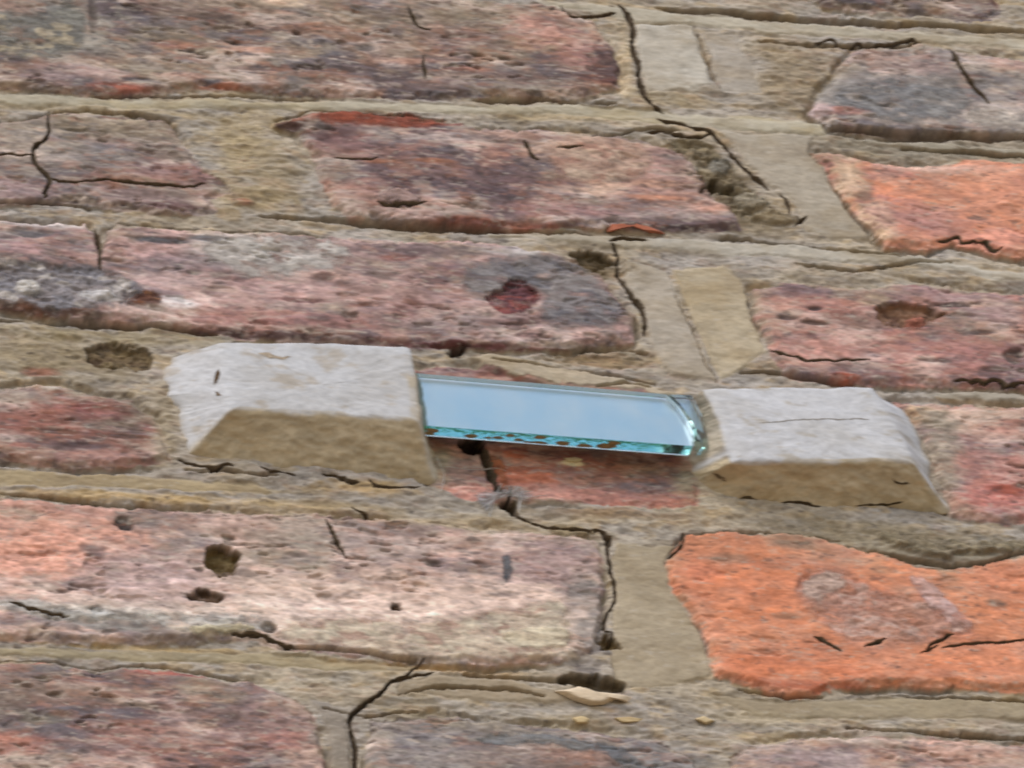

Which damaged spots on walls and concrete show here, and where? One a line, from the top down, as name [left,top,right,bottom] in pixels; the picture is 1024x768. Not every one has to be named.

crack [560,5,806,227]
crack [949,49,989,104]
crack [0,117,206,198]
crack [937,236,1004,254]
spalling [485,280,540,314]
crack [609,237,648,337]
crack [770,350,870,363]
crack [954,378,1024,390]
crack [471,440,617,649]
crack [347,659,434,768]